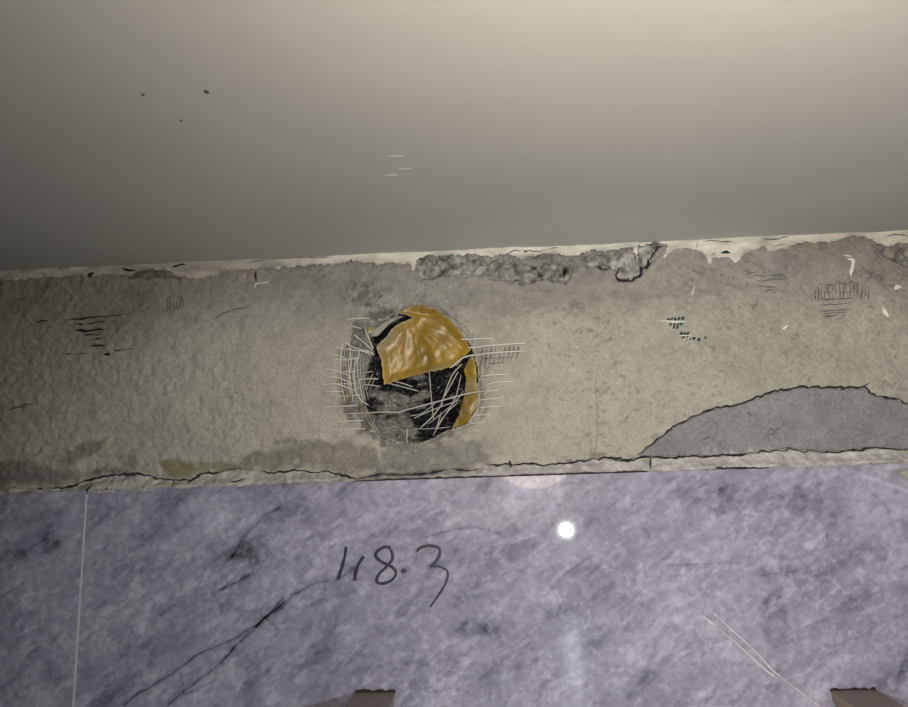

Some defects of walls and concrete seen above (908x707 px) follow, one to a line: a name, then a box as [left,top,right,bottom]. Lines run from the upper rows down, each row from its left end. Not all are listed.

flaking render [416,244,657,286]
flaking render [861,236,908,264]
spalling [340,279,493,455]
crack [30,468,356,493]